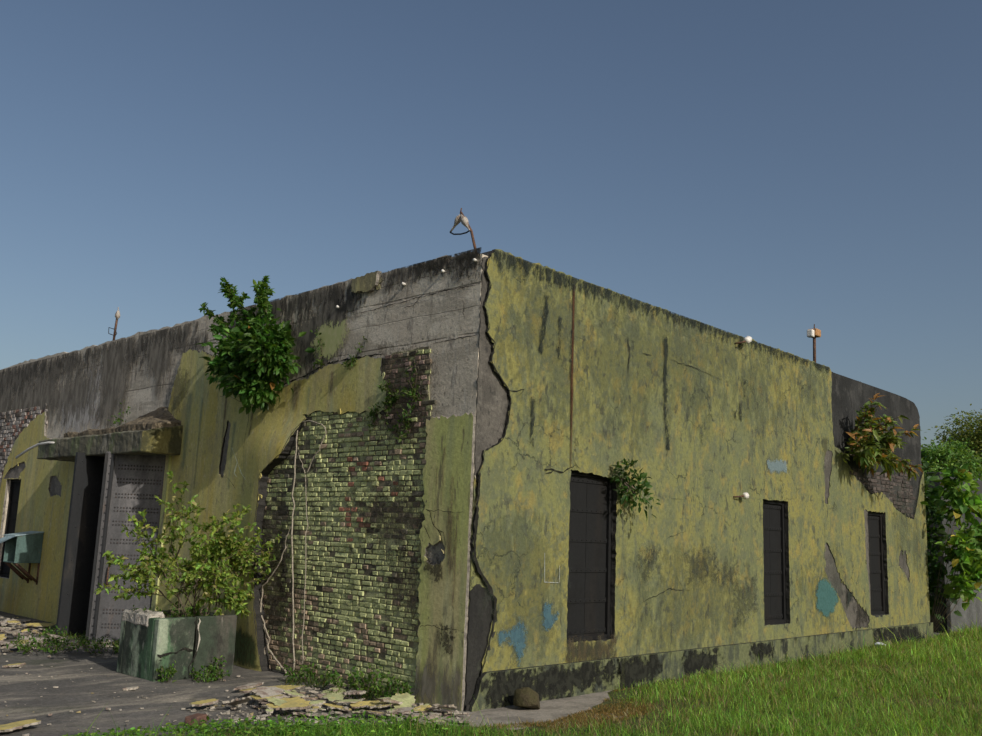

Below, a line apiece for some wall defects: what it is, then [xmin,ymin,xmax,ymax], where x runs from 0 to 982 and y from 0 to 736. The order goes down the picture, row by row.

peeling [0,364,104,487]
damp [0,322,208,427]
spalling [824,371,922,519]
spalling [181,346,445,725]
spalling [456,558,498,719]
damp [481,634,663,709]
damp [682,647,723,677]
damp [749,642,775,661]
spalling [825,507,881,647]
damp [876,625,925,644]